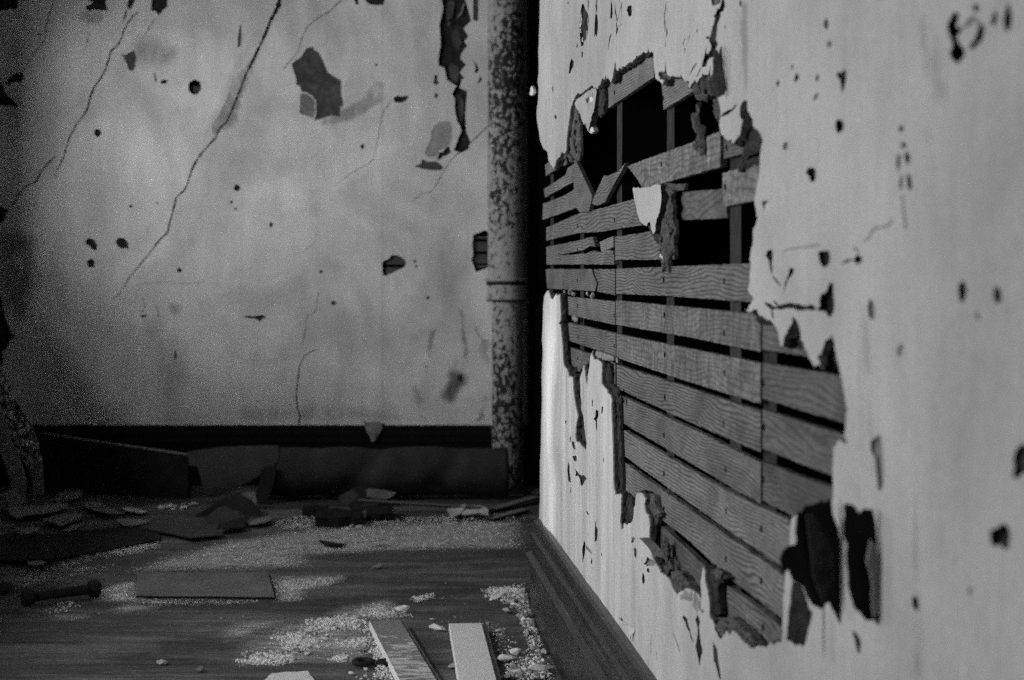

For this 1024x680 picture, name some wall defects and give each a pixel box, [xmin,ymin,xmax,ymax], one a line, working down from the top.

crack [10,0,156,208]
crack [96,0,282,354]
flaking render [292,47,343,120]
flaking render [416,0,482,170]
flaking render [554,49,654,171]
flaking render [658,29,727,122]
flaking render [725,100,763,172]
flaking render [947,2,1012,64]
crack [296,292,319,425]
flaking render [471,230,488,272]
flaking render [817,282,835,317]
flaking render [548,289,881,649]